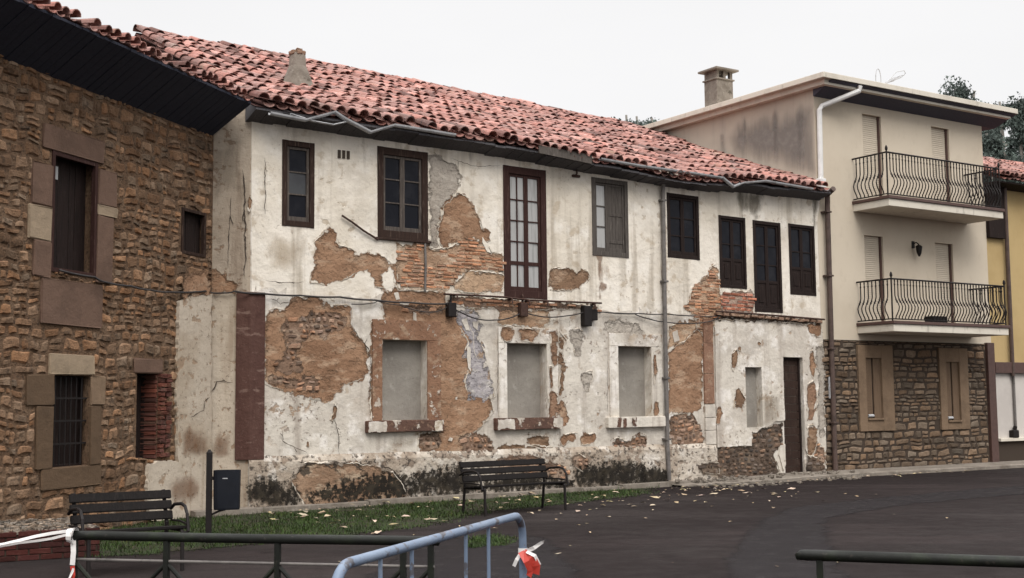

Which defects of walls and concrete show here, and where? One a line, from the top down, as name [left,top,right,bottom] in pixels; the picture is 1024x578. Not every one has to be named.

crack [228,163,301,305]
flaking render [265,153,647,471]
flaking render [653,263,827,479]
leakage [245,460,668,507]